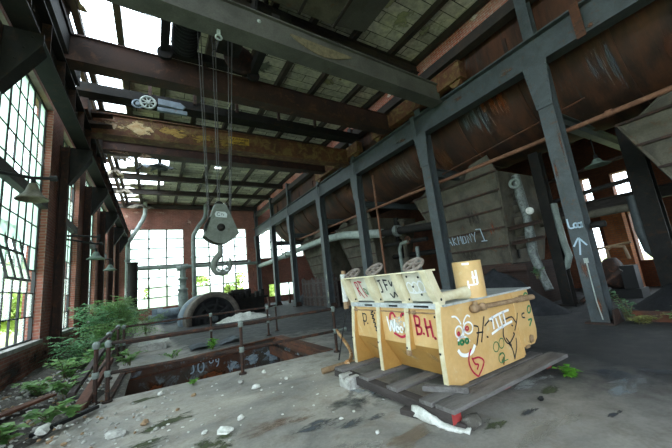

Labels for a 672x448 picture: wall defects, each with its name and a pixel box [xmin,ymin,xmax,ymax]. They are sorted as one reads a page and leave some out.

peeling [104,118,234,148]